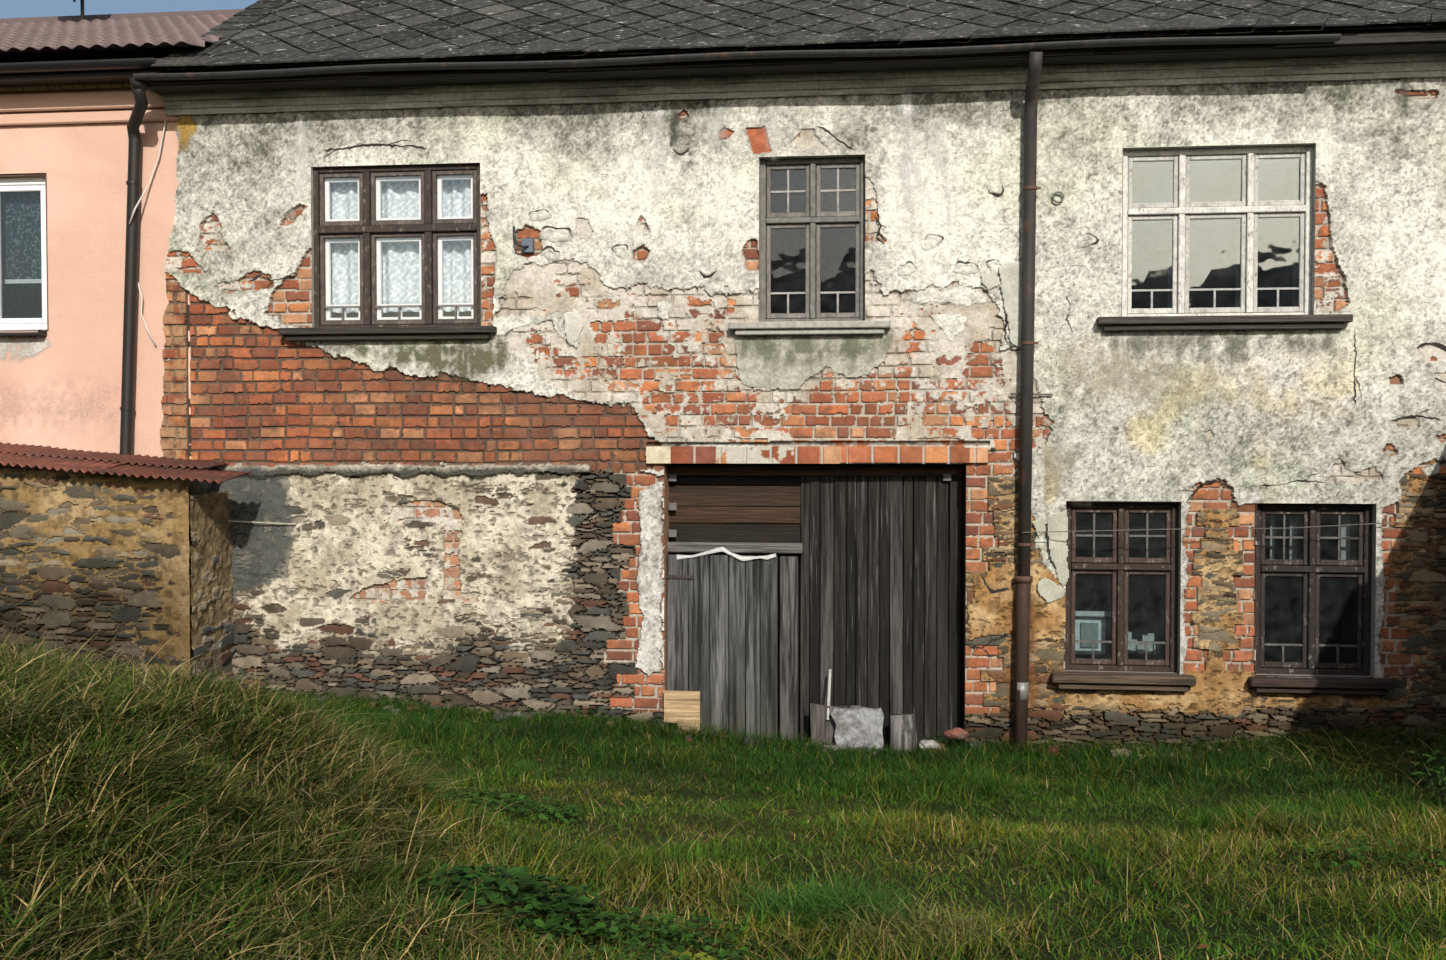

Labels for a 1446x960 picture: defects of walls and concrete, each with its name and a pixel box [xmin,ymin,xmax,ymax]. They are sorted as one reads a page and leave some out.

spalling [718,125,772,154]
spalling [793,128,829,151]
flaking render [0,332,50,359]
flaking render [158,175,1446,751]